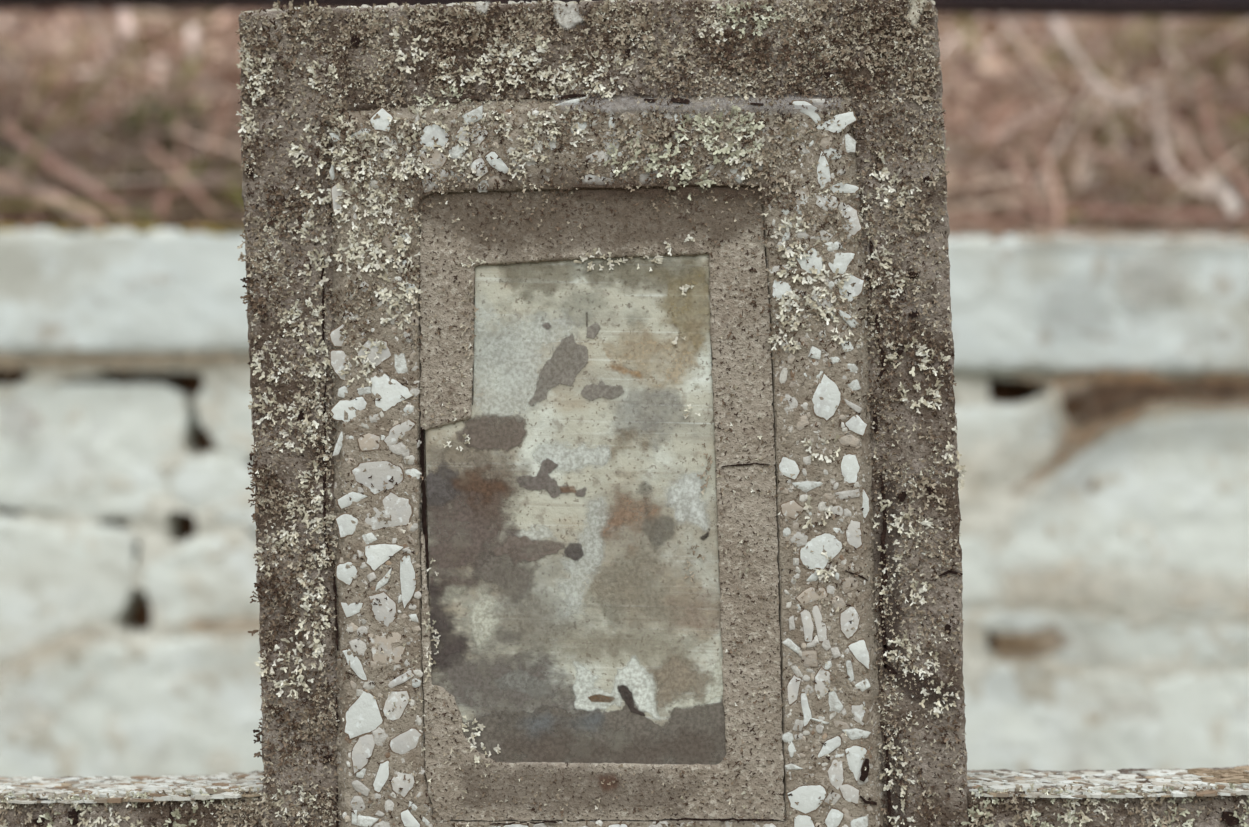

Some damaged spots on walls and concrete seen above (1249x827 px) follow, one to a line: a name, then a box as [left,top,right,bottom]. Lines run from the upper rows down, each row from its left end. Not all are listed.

water stain [414,169,768,246]
water stain [477,315,569,417]
water stain [500,256,710,471]
water stain [426,446,723,720]